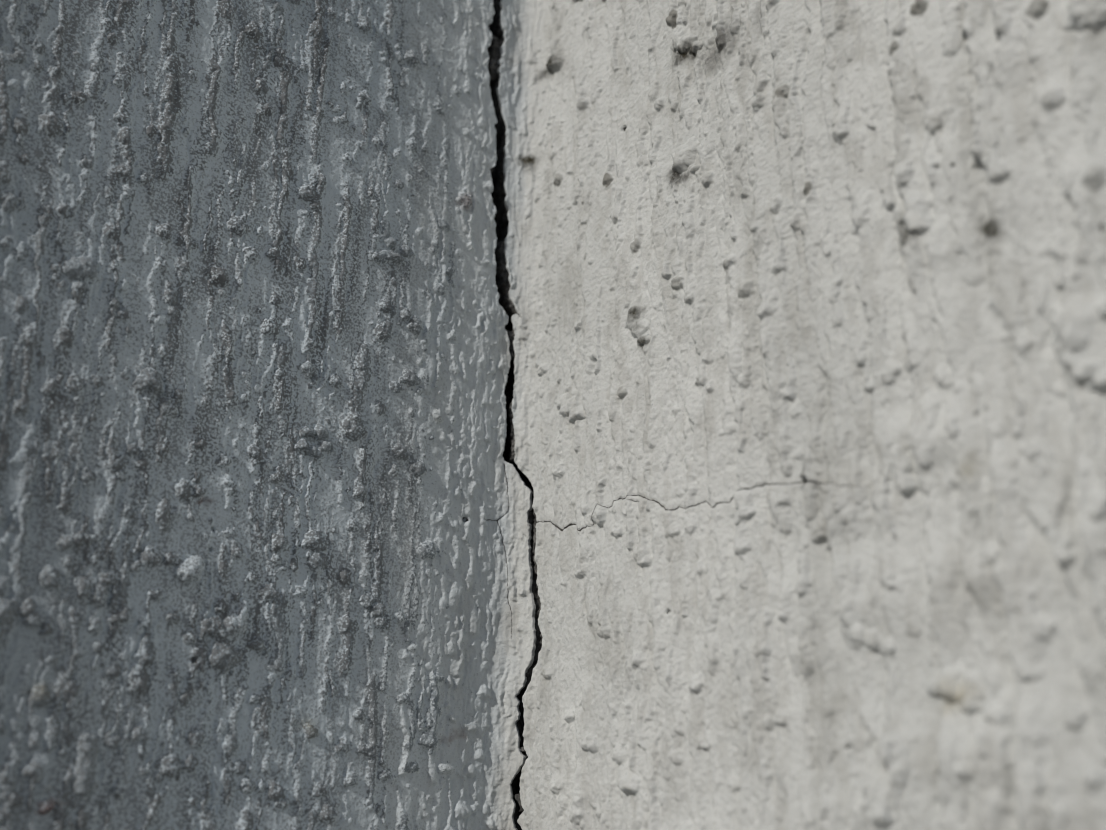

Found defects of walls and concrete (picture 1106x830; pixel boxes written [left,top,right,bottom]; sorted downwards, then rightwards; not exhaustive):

crack [487,0,878,830]